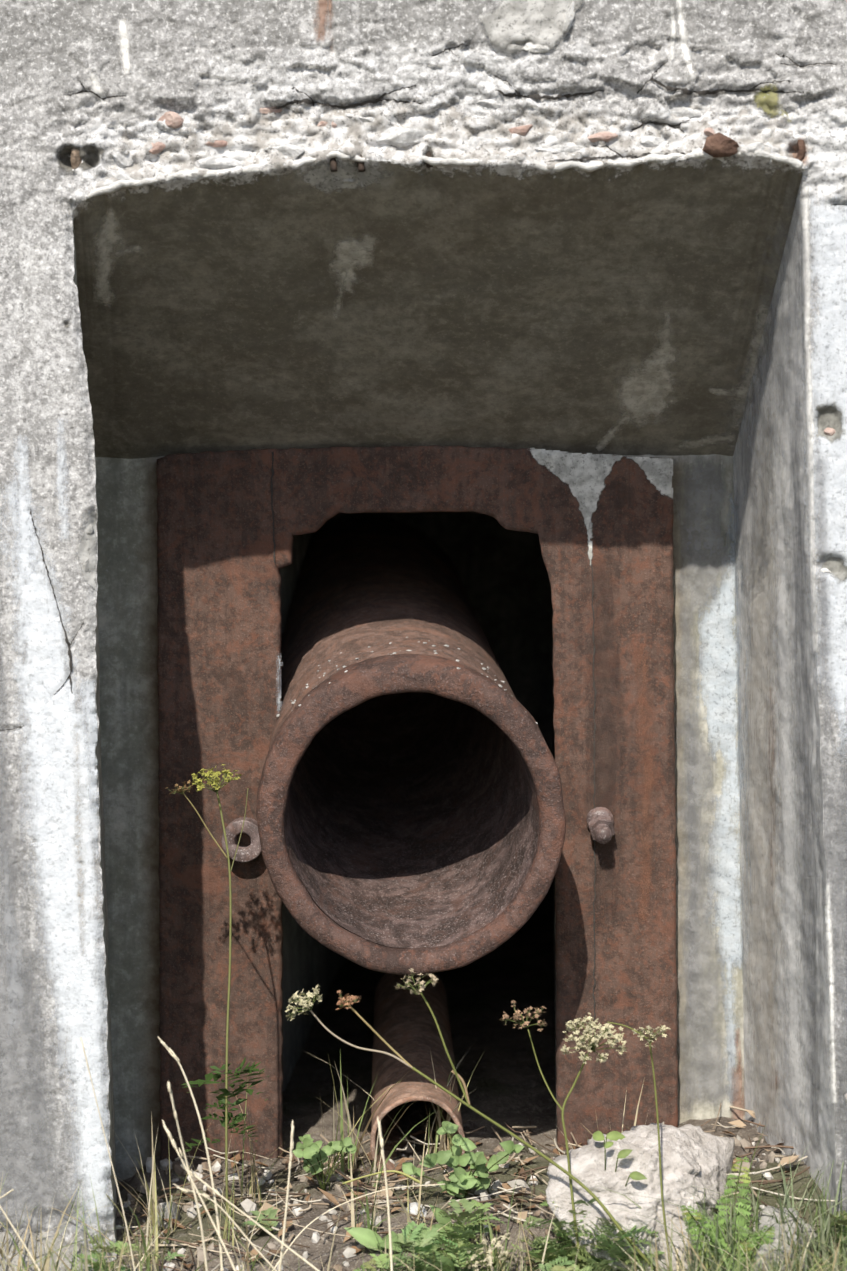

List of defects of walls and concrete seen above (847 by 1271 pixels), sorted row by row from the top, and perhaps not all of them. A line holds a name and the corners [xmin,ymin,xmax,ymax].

crack [63,80,126,100]
crack [273,85,423,109]
spalling [60,95,815,219]
crack [492,74,605,100]
crack [547,53,837,162]
water stain [331,235,376,317]
water stain [596,313,676,451]
peeling [799,195,847,759]
crack [30,509,84,695]
water stain [678,185,847,1161]